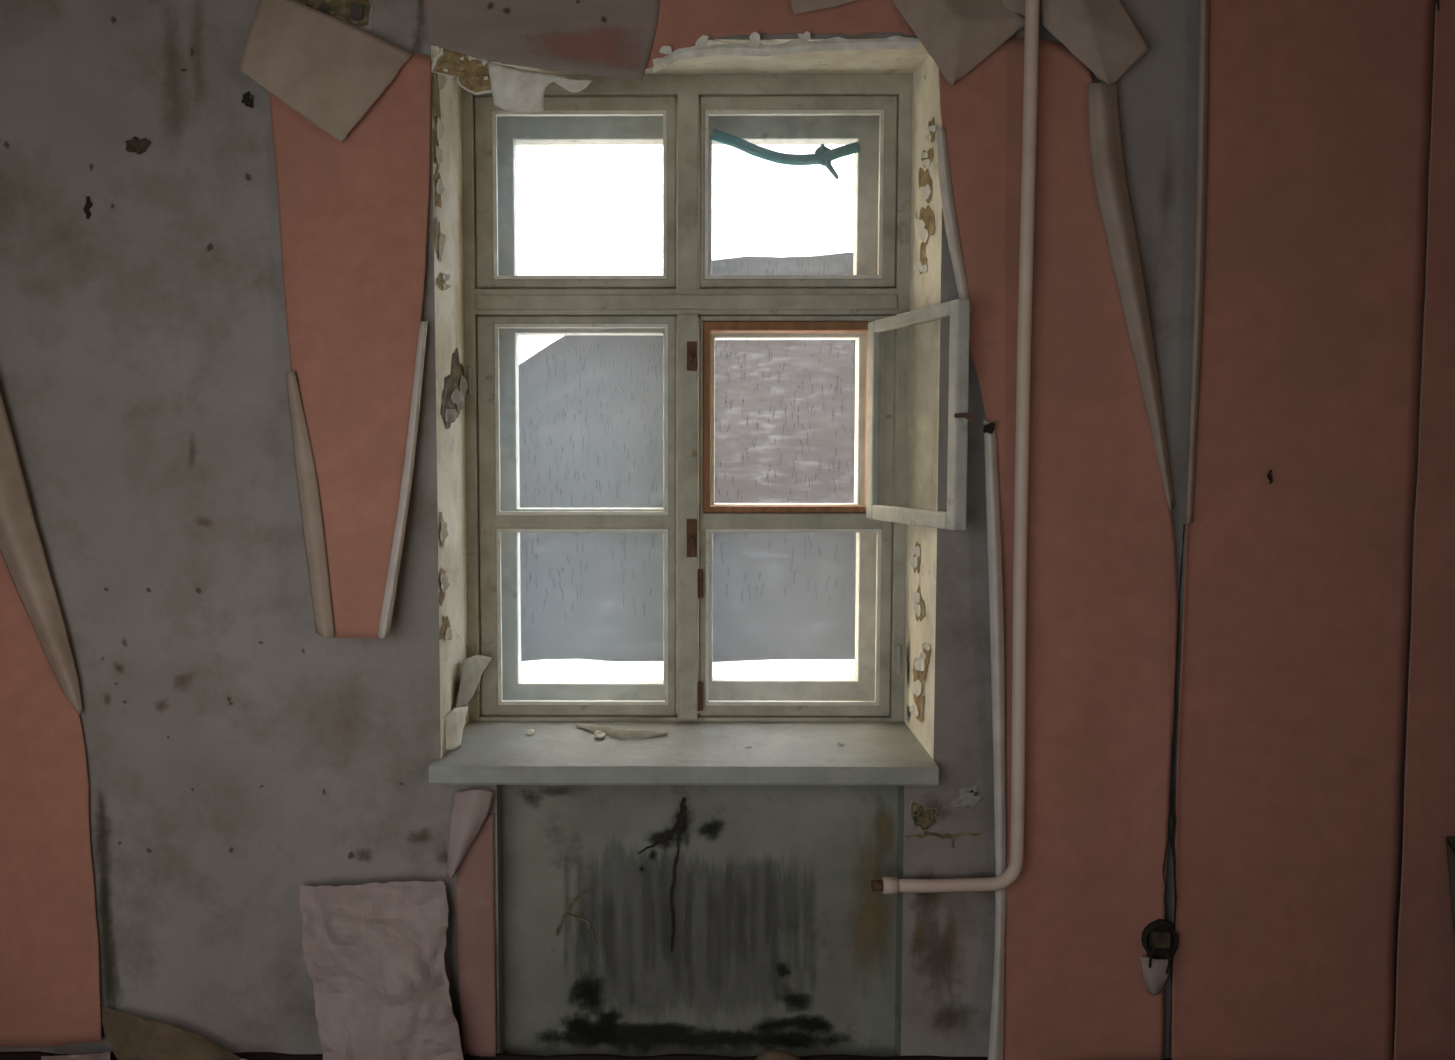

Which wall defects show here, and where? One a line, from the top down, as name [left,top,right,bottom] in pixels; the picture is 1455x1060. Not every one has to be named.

flaking render [296,0,375,31]
flaking render [652,31,919,73]
flaking render [241,91,254,109]
flaking render [83,196,93,219]
flaking render [124,135,153,155]
flaking render [431,47,492,291]
peeling [913,118,936,274]
peeling [440,348,468,429]
peeling [439,512,449,548]
peeling [439,567,453,640]
peeling [445,655,493,750]
leakage [540,846,849,1052]